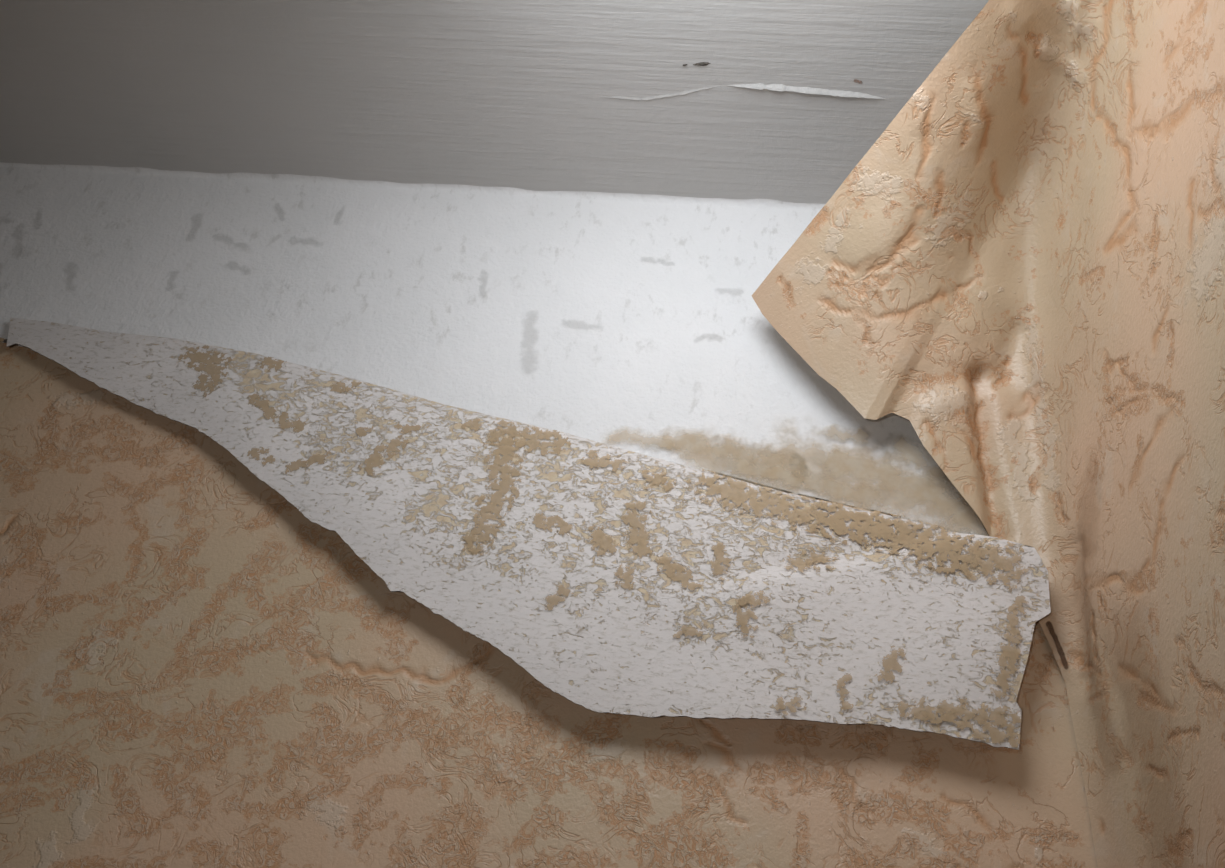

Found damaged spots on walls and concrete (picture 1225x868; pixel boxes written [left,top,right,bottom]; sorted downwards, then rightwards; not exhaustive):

peeling [178,344,232,397]
peeling [258,357,284,372]
peeling [330,381,362,393]
peeling [248,394,306,434]
peeling [247,447,331,474]
peeling [356,424,421,476]
peeling [581,450,627,472]
peeling [461,418,573,556]
peeling [545,585,574,611]
peeling [588,469,1029,747]